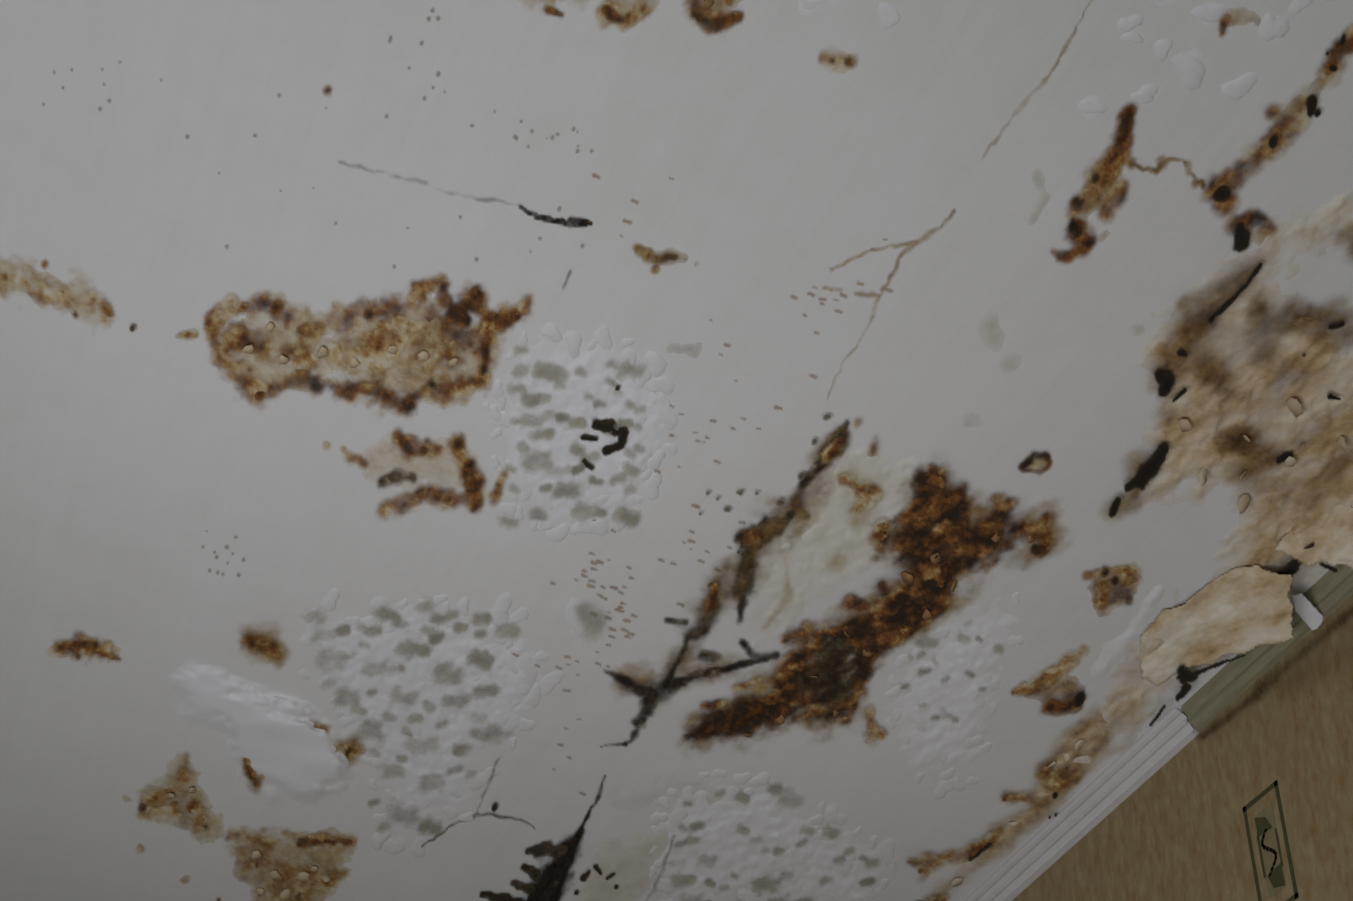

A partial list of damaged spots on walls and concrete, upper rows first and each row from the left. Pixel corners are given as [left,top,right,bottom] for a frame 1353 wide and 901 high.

rust [597,0,660,33]
rust [688,0,743,34]
rust [1220,7,1261,36]
rust [1051,26,1353,263]
rust [0,260,115,323]
rust [175,275,531,414]
flaking render [1108,188,1353,595]
rust [323,430,506,517]
rust [683,465,1060,747]
crack [606,584,745,746]
crack [581,776,606,829]
leakage [480,842,568,901]